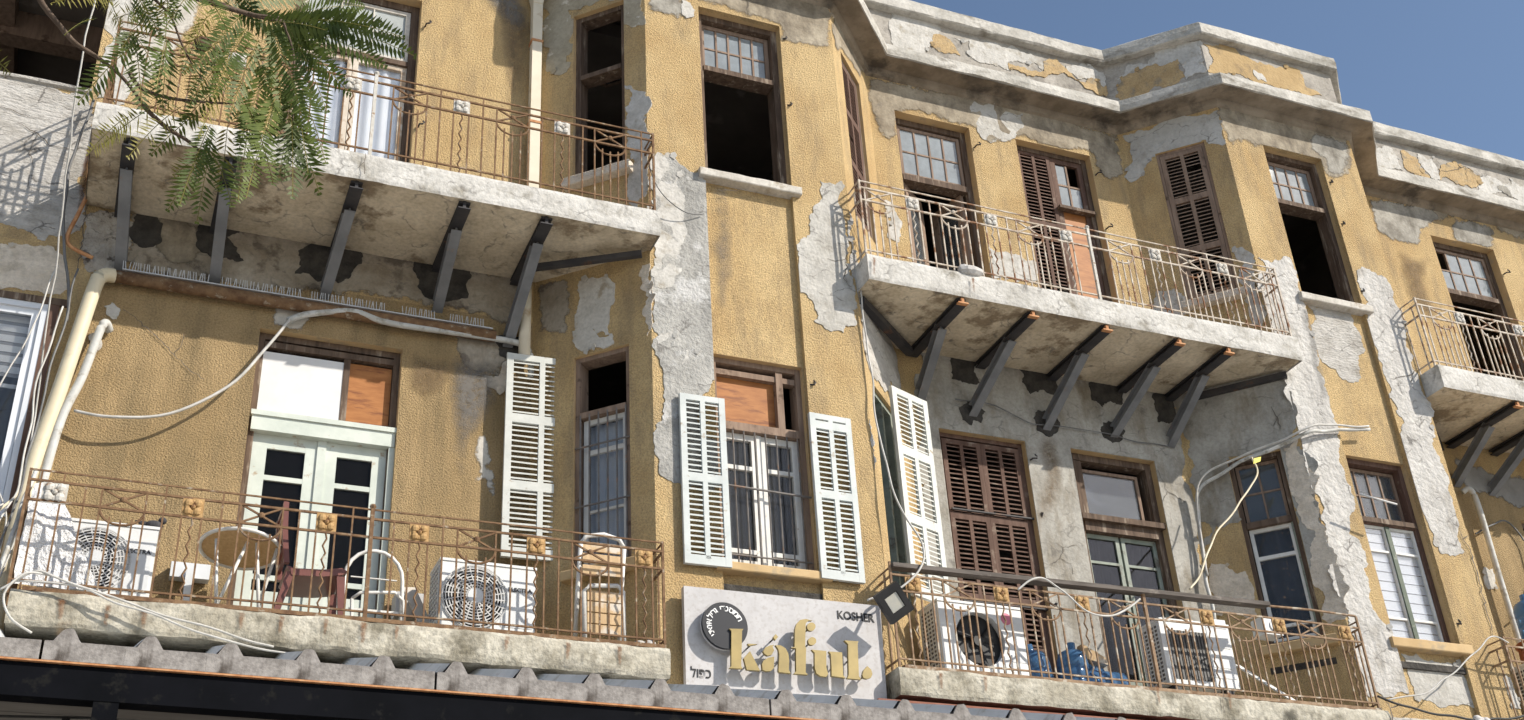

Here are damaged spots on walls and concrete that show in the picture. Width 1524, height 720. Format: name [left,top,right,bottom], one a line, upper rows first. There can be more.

crack [1,106,69,167]
peeling [0,0,519,395]
peeling [538,274,615,355]
peeling [625,85,719,492]
peeling [542,0,1352,183]
peeling [475,436,495,495]
peeling [797,181,1524,709]